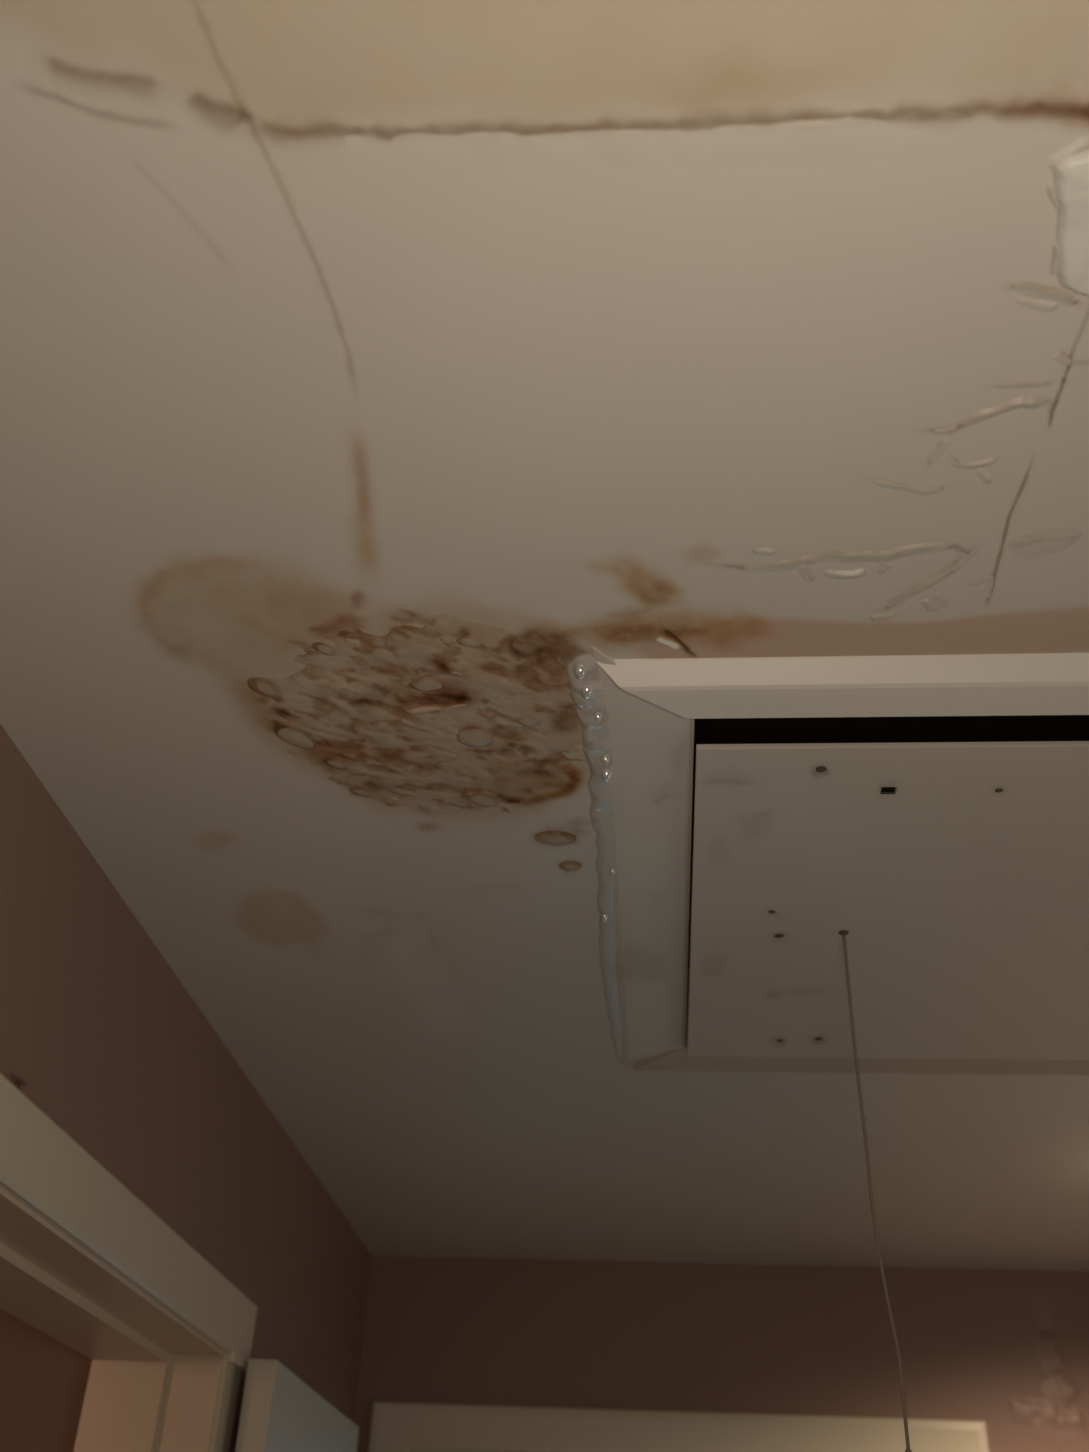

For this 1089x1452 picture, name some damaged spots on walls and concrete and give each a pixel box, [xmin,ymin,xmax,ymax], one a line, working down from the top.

crack [320,115,962,177]
peeling [1046,136,1089,297]
leakage [655,635,691,653]
leakage [247,613,622,1064]